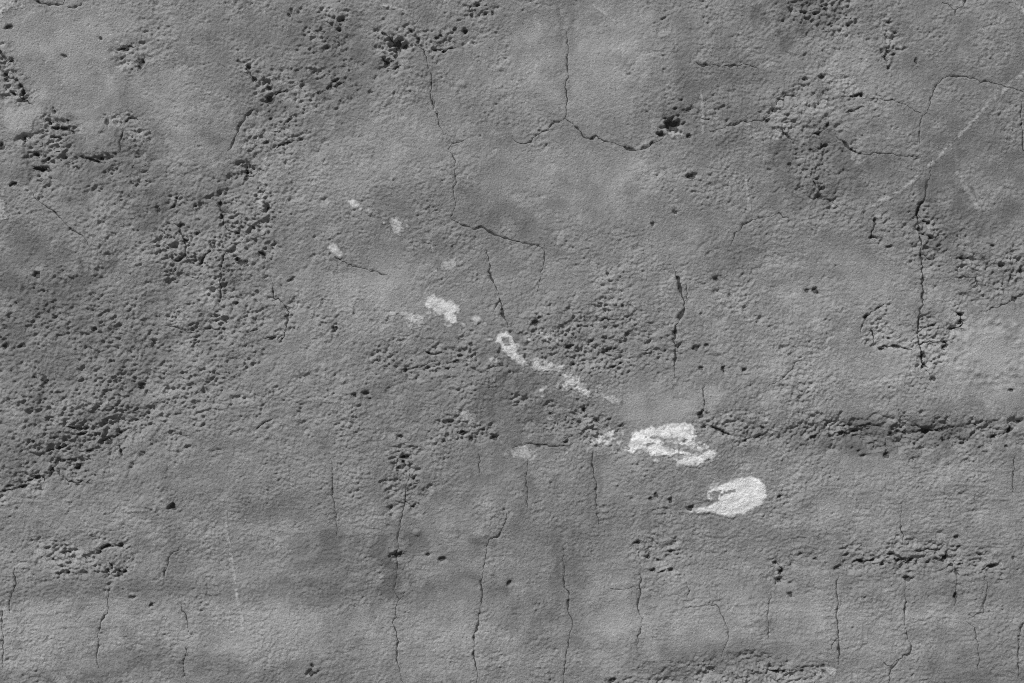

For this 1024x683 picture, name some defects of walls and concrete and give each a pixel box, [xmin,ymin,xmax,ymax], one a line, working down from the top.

crack [513,33,666,151]
crack [421,48,545,328]
damp [690,219,781,302]
crack [837,75,1024,377]
crack [672,274,687,376]
damp [510,442,539,532]
damp [635,456,665,536]
crack [392,455,411,682]
crack [472,460,528,681]
crack [563,549,573,674]
damp [621,569,653,669]